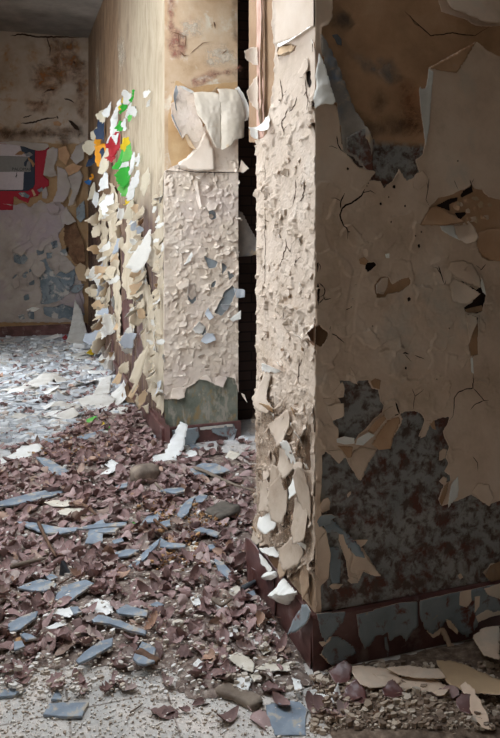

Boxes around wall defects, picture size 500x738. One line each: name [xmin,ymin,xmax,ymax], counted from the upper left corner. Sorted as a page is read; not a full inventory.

crack [12,33,80,52]
water stain [35,38,84,92]
crack [410,16,487,36]
peeling [298,0,500,190]
water stain [0,128,80,144]
peeling [168,0,311,249]
crack [335,189,374,239]
peeling [12,141,500,704]
crack [449,378,487,421]